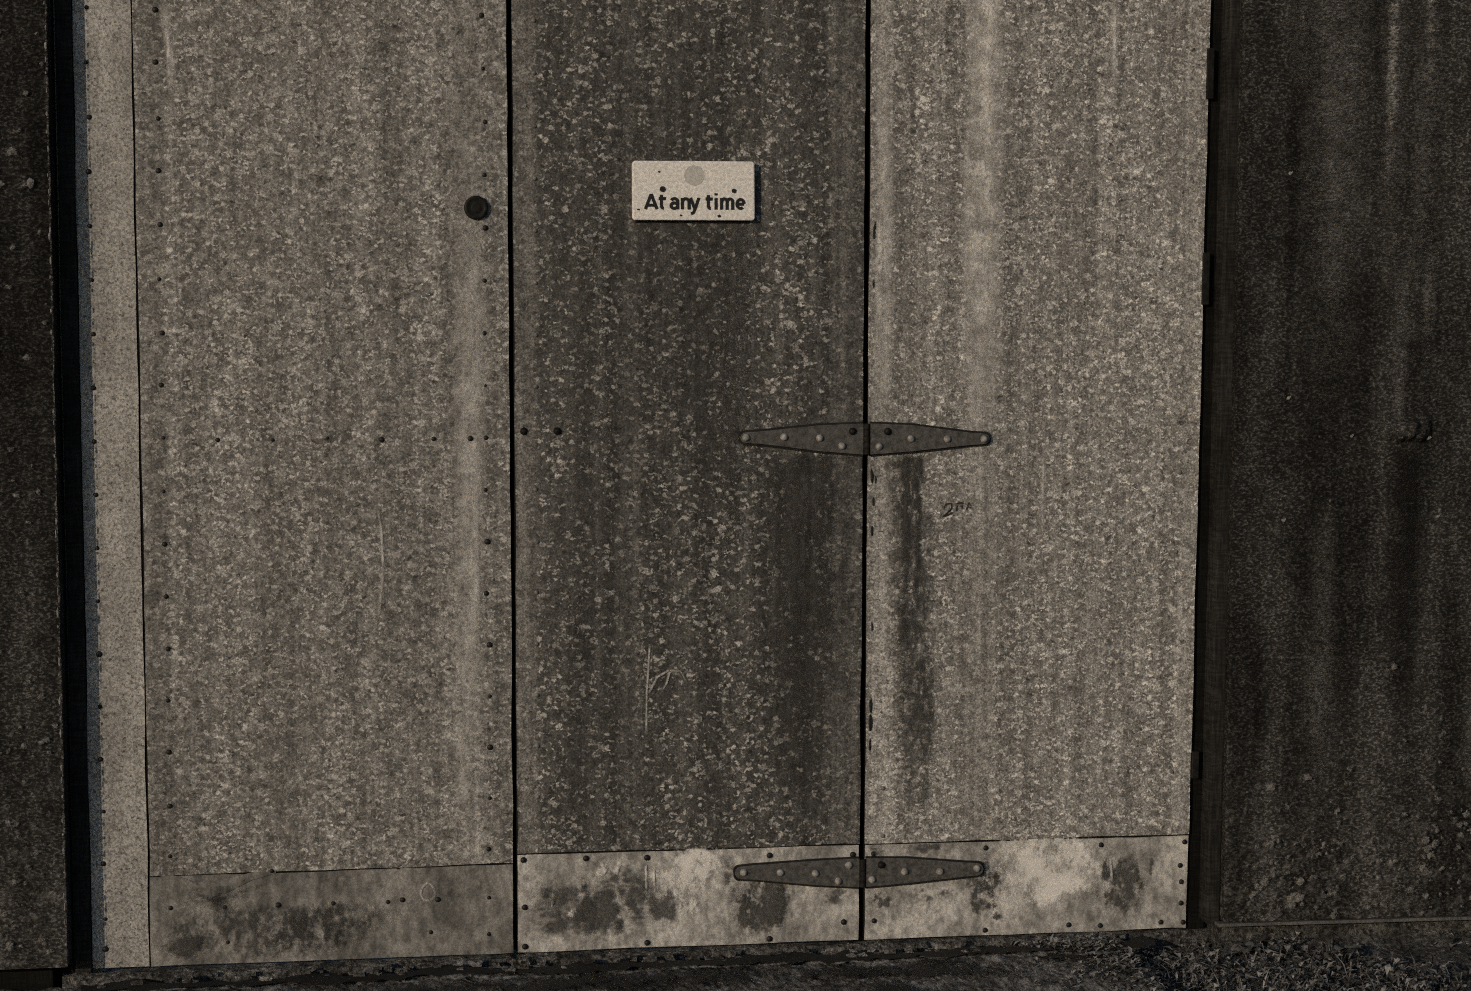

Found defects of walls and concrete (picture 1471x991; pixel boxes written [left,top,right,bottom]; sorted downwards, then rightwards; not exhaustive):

damp [1385,1,1403,184]
corrosion [897,457,930,748]